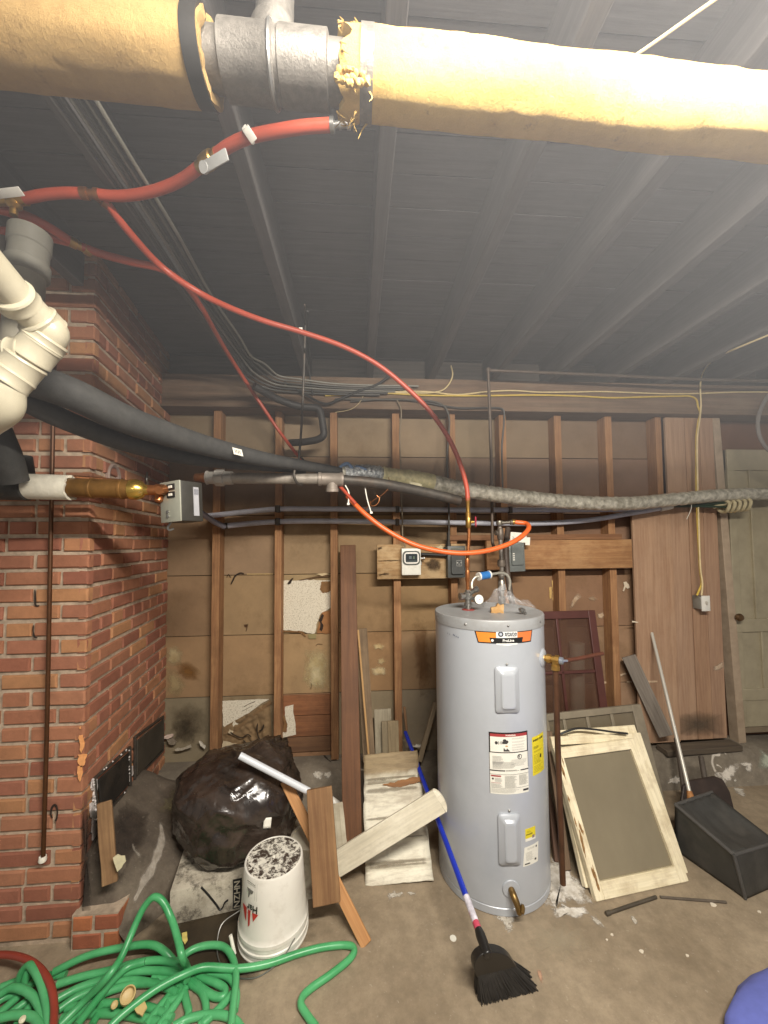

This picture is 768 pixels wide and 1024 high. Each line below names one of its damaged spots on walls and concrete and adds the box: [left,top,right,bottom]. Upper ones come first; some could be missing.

peeling [283,573,331,639]
peeling [222,699,269,727]
spalling [77,726,87,781]
leakage [546,859,603,925]